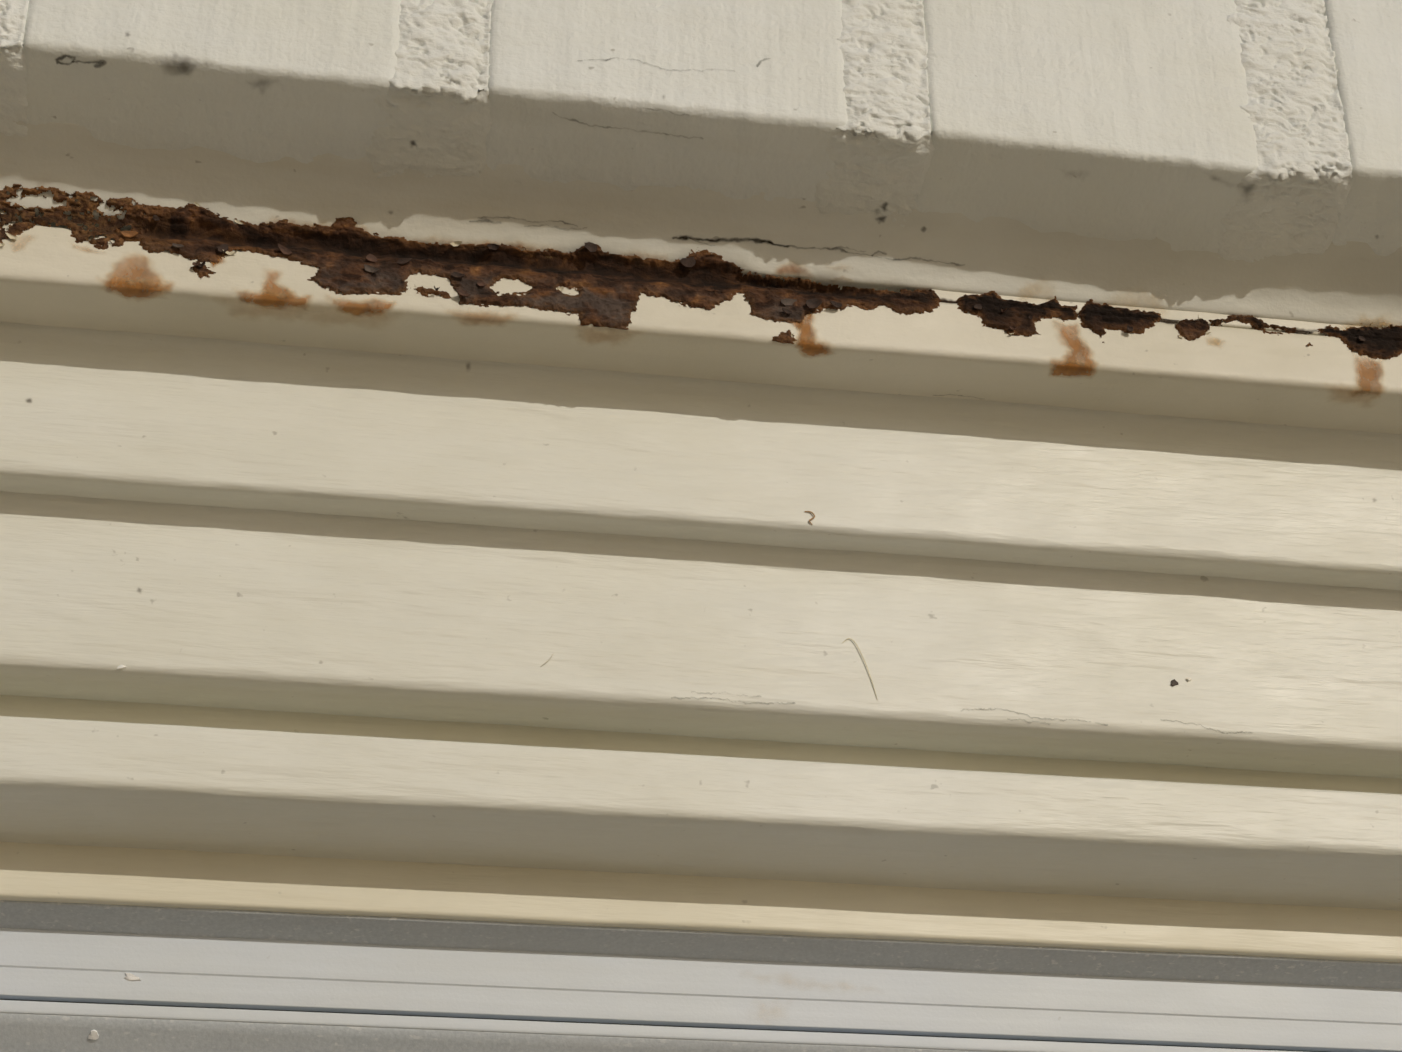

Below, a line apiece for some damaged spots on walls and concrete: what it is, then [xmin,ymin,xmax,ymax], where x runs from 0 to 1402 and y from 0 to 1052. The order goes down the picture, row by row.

corrosion [107,260,170,298]
corrosion [241,275,307,308]
corrosion [339,300,392,315]
corrosion [794,314,829,356]
corrosion [1052,329,1093,376]
corrosion [1358,362,1381,393]